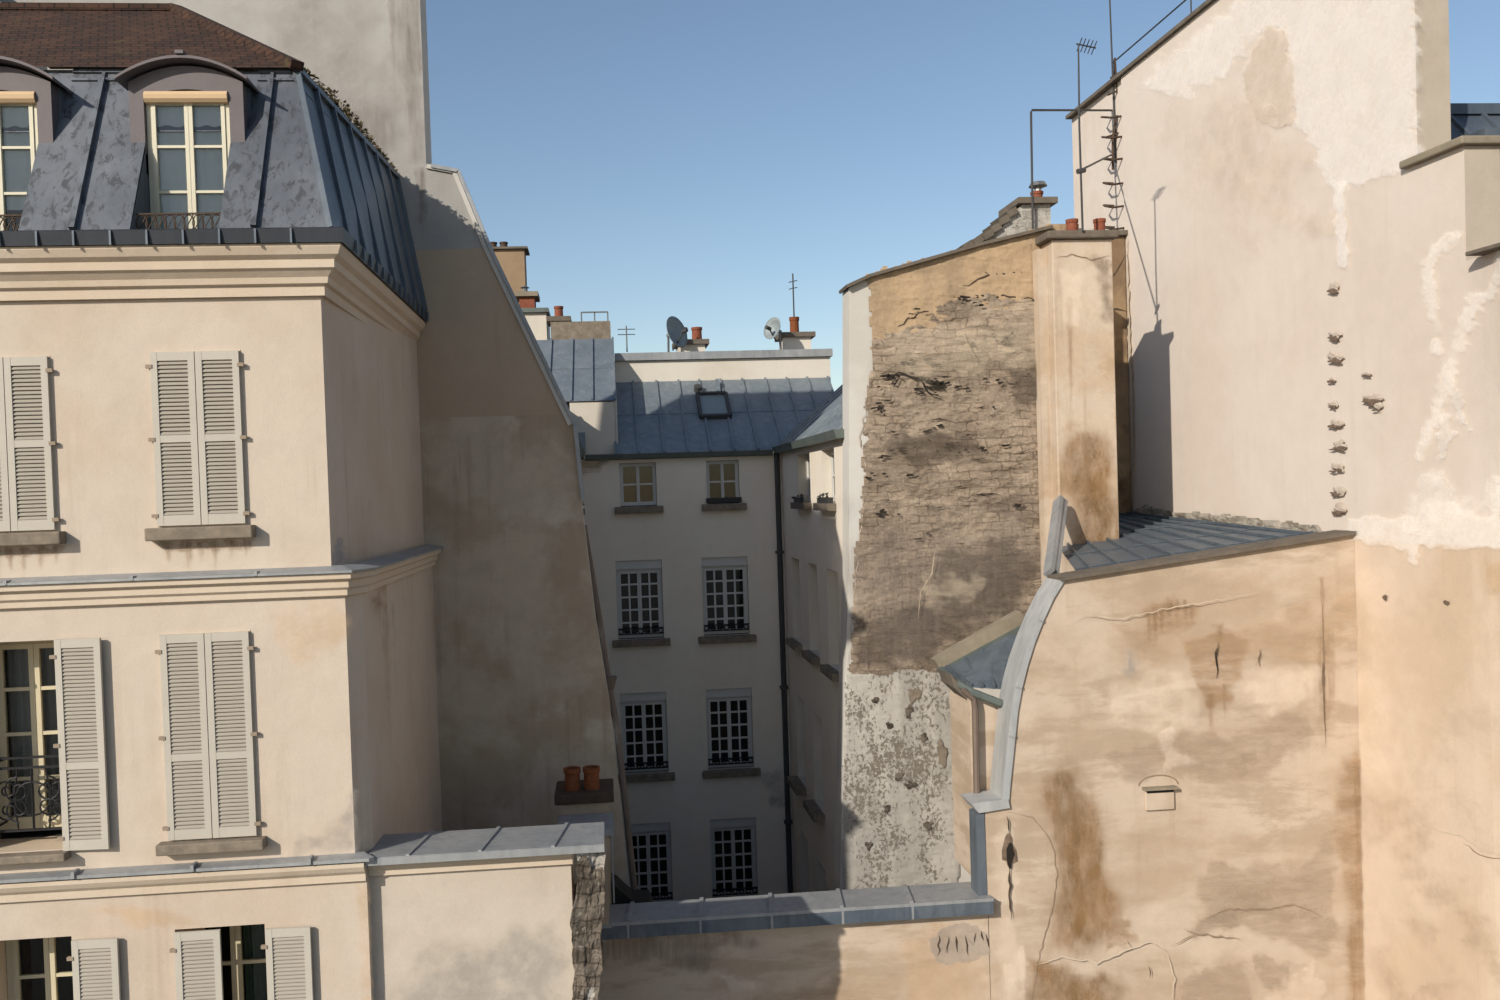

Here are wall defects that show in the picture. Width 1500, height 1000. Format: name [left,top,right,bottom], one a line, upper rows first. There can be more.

water stain [1066,439,1119,544]
flaking render [841,293,1041,890]
crack [1213,643,1221,679]
crack [1320,603,1328,744]
water stain [1047,775,1127,942]
flaking render [930,923,990,964]
water stain [1034,964,1105,1000]